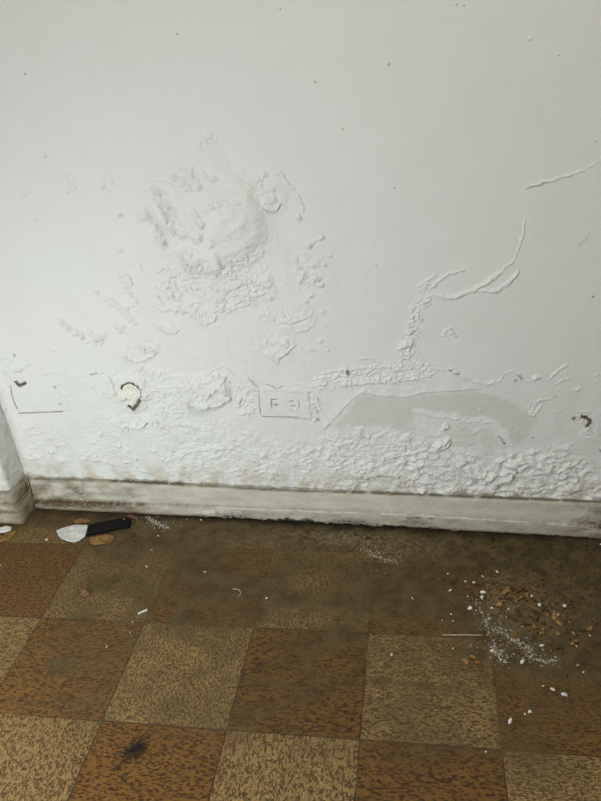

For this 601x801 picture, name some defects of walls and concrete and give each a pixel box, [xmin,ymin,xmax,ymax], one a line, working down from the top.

spalling [107,372,154,415]
water stain [33,482,150,512]
water stain [178,509,460,531]